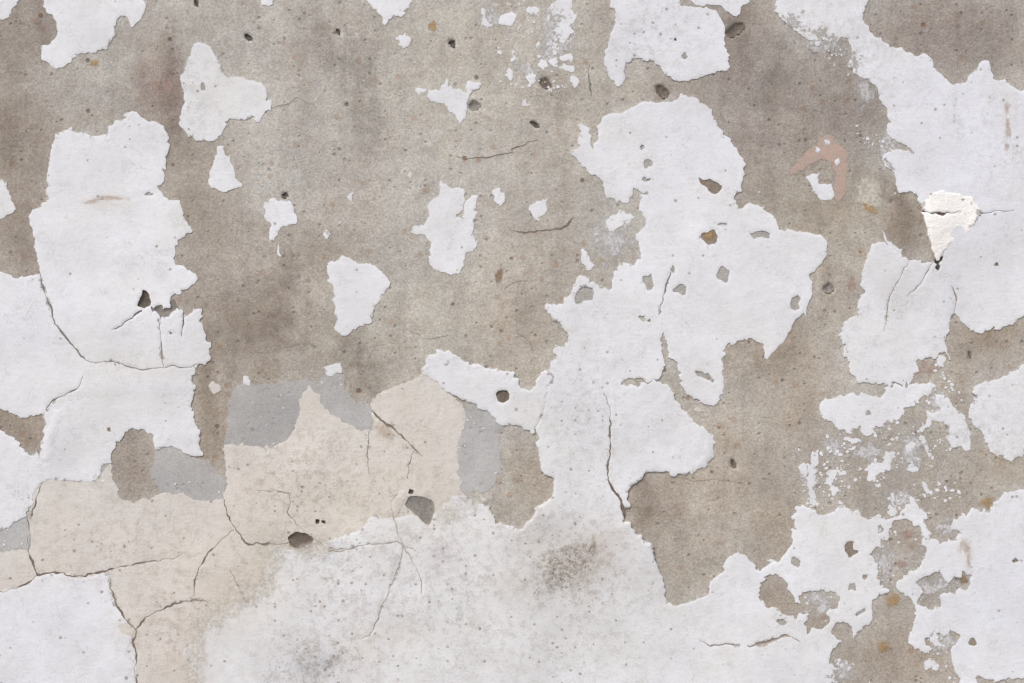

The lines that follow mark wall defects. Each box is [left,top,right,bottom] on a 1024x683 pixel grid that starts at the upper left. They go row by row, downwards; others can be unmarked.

peeling [0,0,749,503]
crack [921,209,1013,217]
crack [38,271,197,409]
peeling [623,0,1024,683]
peeling [462,423,554,529]
crack [604,394,626,518]
crack [0,411,423,683]